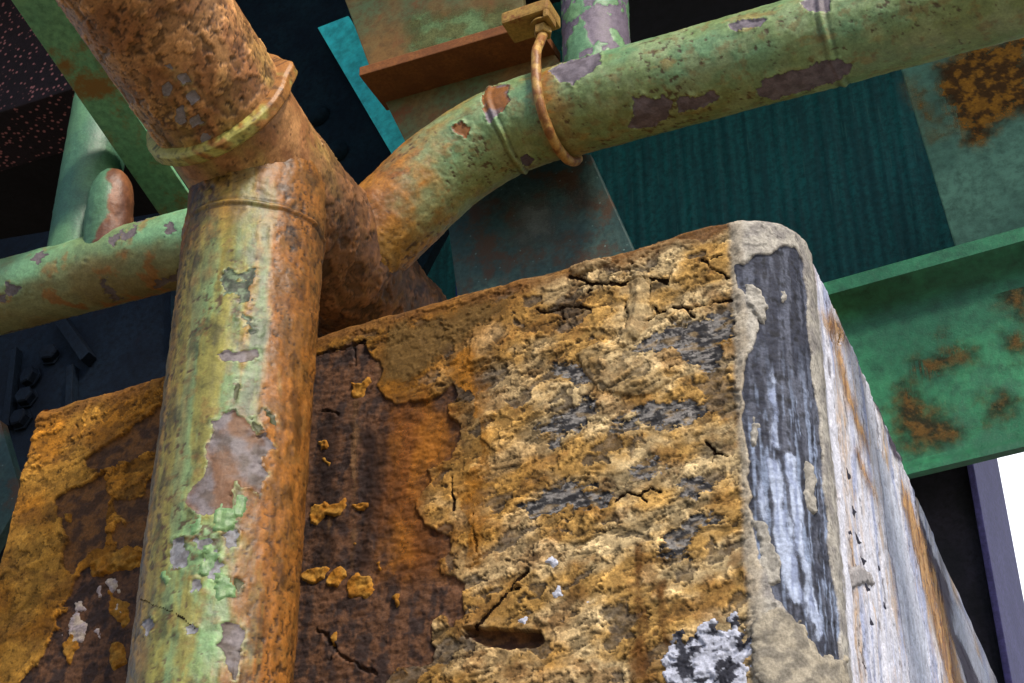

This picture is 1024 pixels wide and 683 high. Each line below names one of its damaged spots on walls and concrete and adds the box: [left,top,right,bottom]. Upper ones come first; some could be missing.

peeling [756,58,853,100]
corrosion [916,38,1024,145]
crack [536,254,733,322]
corrosion [911,346,970,377]
corrosion [894,389,959,450]
peeling [160,383,276,601]
damp [758,377,823,640]
spalling [20,407,161,683]
crack [465,570,530,639]